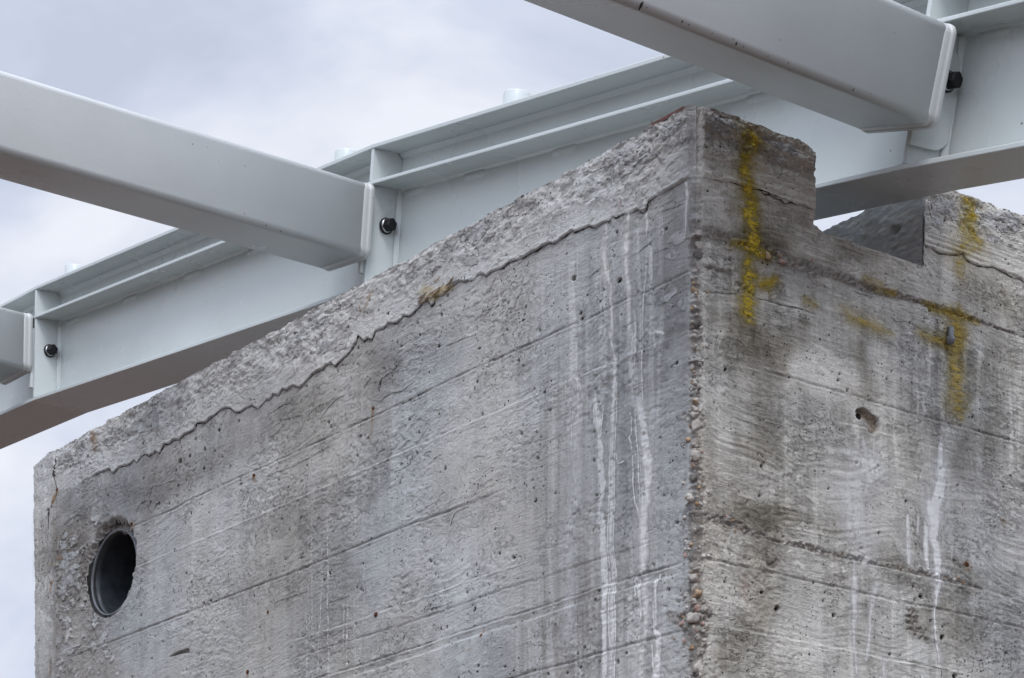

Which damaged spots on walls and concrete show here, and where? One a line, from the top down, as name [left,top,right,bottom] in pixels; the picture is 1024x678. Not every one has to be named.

crack [94,178,813,476]
damp [563,210,664,678]
spalling [660,227,1015,678]
damp [906,437,947,662]